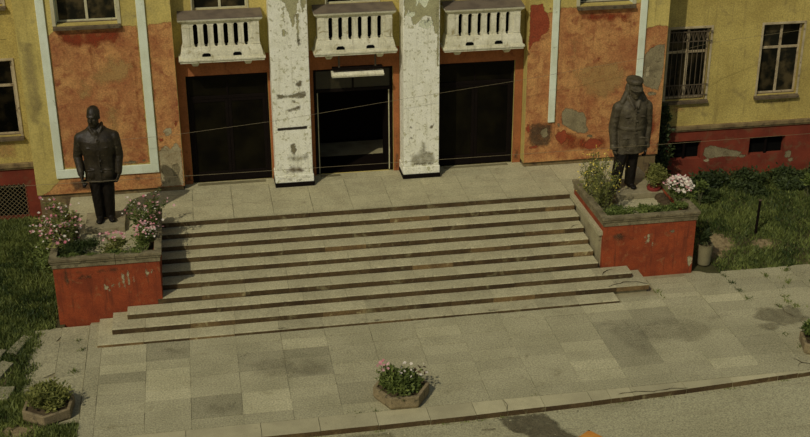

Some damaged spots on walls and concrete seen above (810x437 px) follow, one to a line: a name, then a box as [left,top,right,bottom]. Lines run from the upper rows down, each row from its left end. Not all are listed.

peeling [281,0,306,45]
peeling [404,0,440,66]
spalling [643,44,665,96]
spalling [277,92,306,111]
peeling [159,121,190,187]
leakage [526,124,551,149]
spalling [555,108,603,150]
peeling [703,145,746,162]
leakage [498,413,577,437]